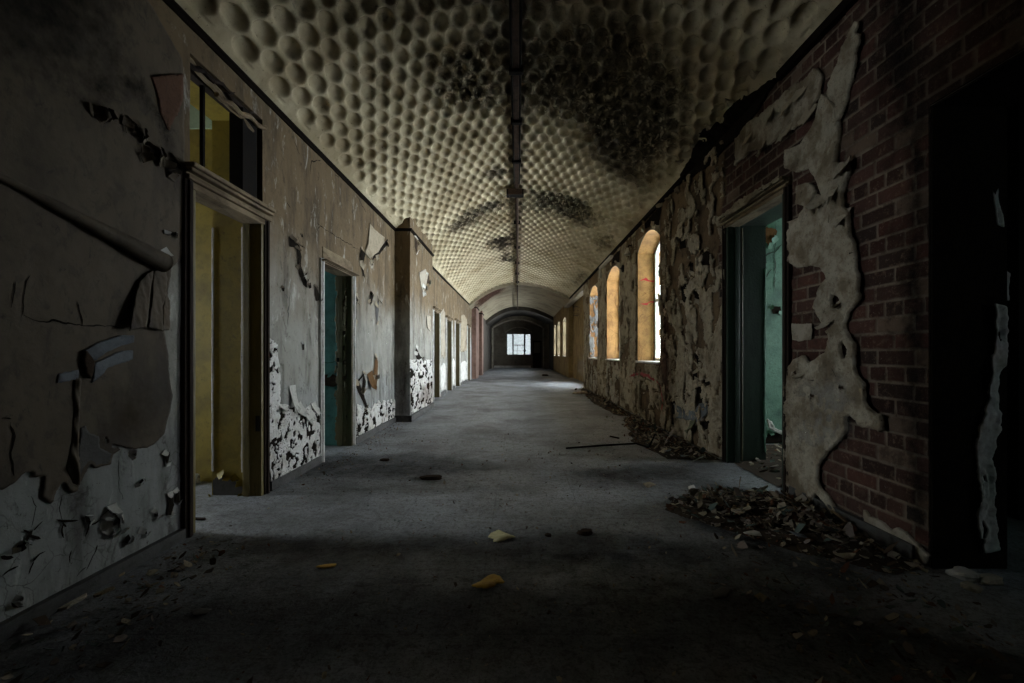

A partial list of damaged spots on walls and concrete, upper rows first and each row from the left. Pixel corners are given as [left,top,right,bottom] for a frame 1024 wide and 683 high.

leakage [521,15,685,179]
peeling [0,0,188,504]
flaking render [359,224,389,277]
leakage [453,201,502,231]
leakage [486,233,516,262]
leakage [531,190,593,227]
flaking render [439,17,885,514]
peeling [270,339,321,481]
peeling [289,234,395,444]
peeling [409,309,467,413]
peeling [975,271,1011,553]
flaking render [863,510,932,565]